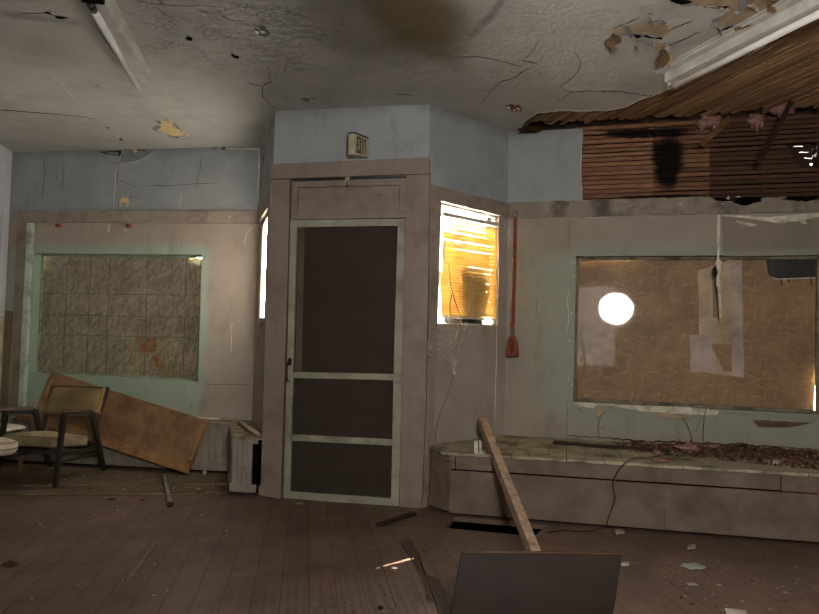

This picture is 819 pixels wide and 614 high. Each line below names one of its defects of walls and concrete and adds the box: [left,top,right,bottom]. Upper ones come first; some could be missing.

peeling [605,13,700,68]
spalling [668,0,781,38]
crack [1,77,91,119]
crack [432,45,536,100]
crack [560,53,647,100]
spalling [152,119,189,138]
leakage [606,128,698,199]